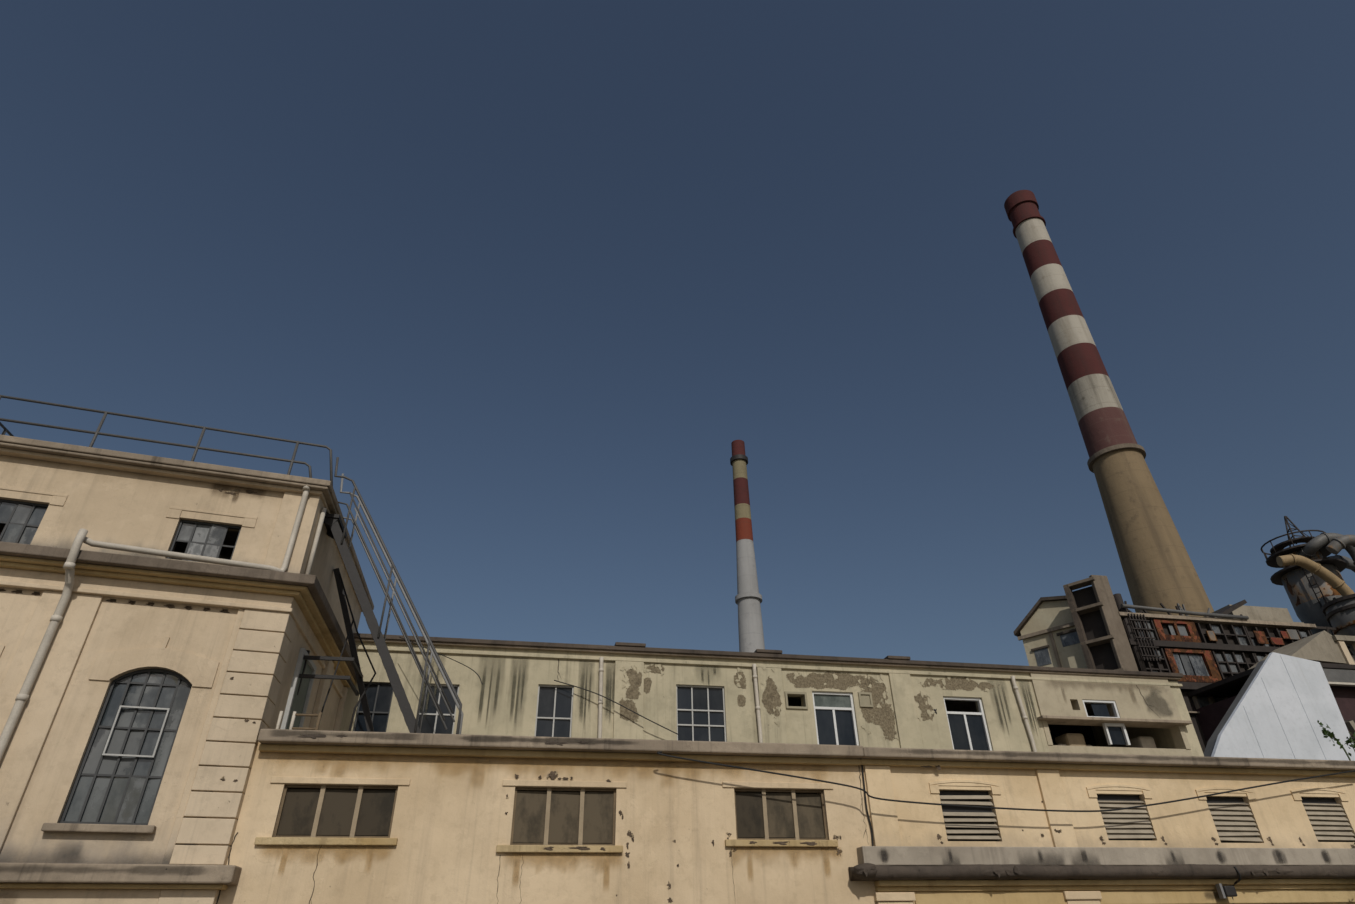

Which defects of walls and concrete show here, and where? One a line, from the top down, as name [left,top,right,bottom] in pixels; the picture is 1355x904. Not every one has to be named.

damp [479,675,524,716]
peeling [619,663,665,724]
peeling [734,667,899,741]
peeling [914,676,999,721]